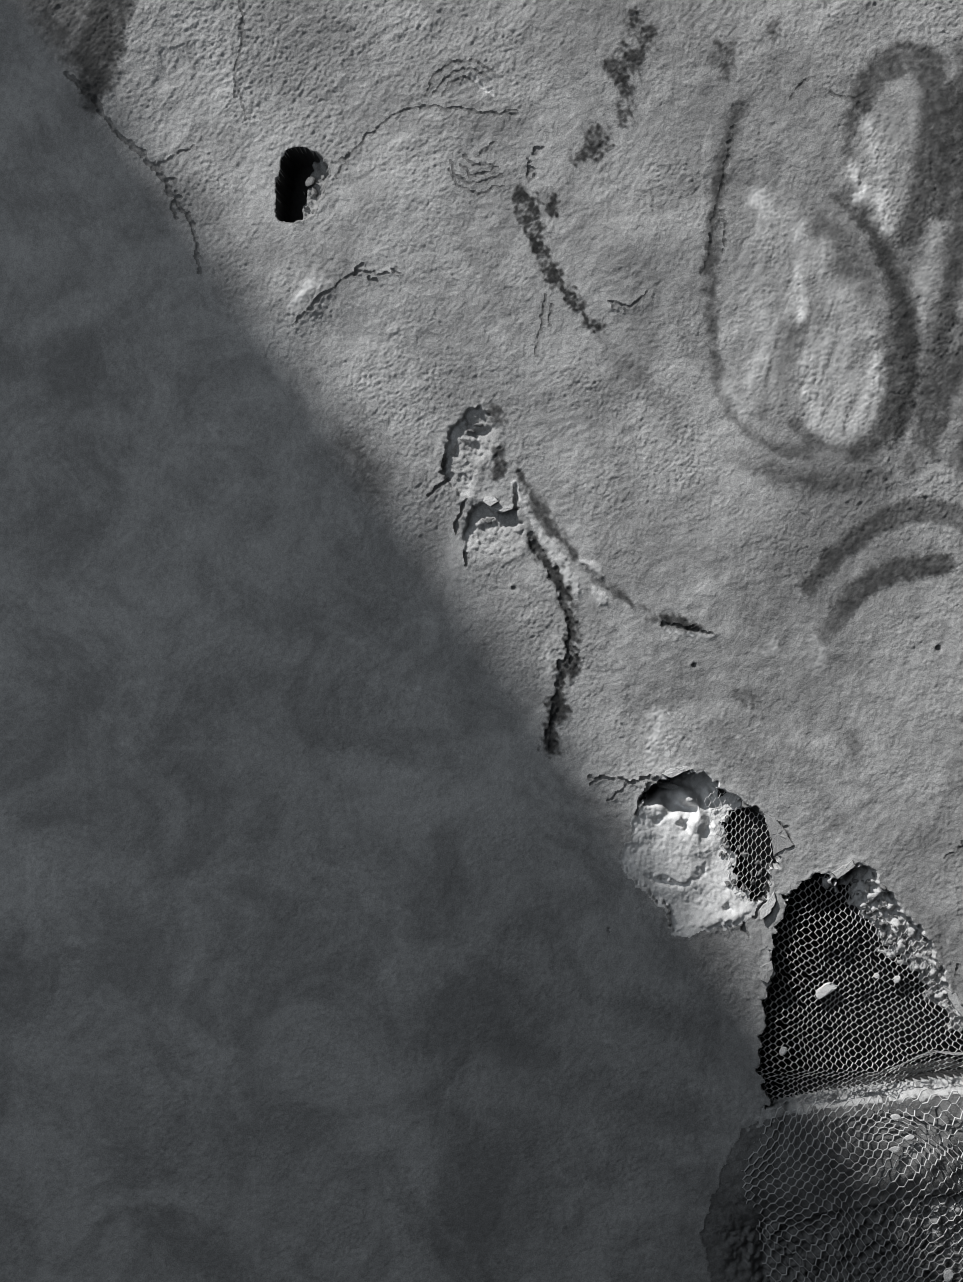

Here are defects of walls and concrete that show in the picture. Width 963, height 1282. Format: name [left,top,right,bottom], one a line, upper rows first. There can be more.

spalling [274,146,331,224]
crack [334,58,545,197]
crack [292,262,402,327]
crack [426,453,469,568]
flaking render [443,403,526,564]
crack [512,484,581,749]
spalling [618,766,963,1282]